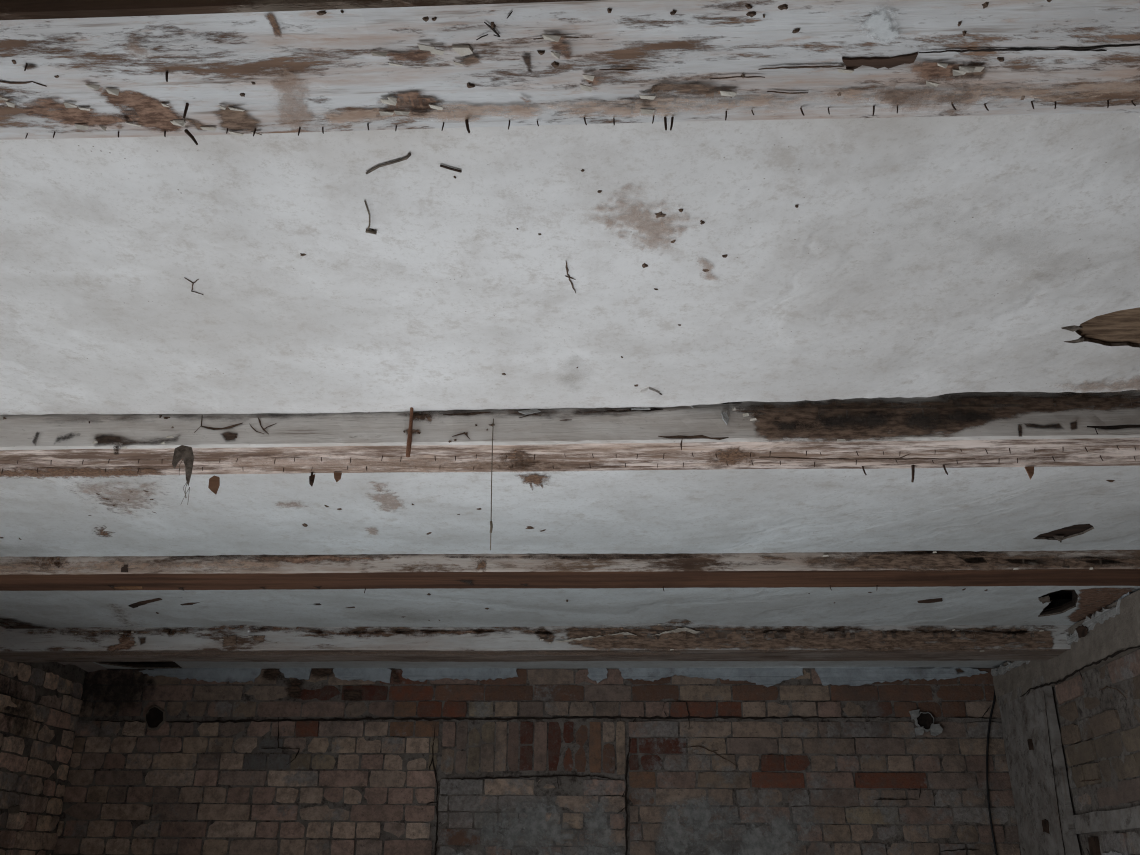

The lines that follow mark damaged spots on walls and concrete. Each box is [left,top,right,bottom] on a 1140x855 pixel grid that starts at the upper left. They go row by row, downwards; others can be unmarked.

spalling [861,11,899,43]
peeling [370,43,480,67]
peeling [542,34,571,59]
spalling [837,52,985,87]
peeling [0,81,262,136]
peeling [379,92,444,116]
peeling [639,83,737,115]
peeling [721,394,1140,442]
peeling [1069,588,1135,622]
peeling [108,625,495,651]